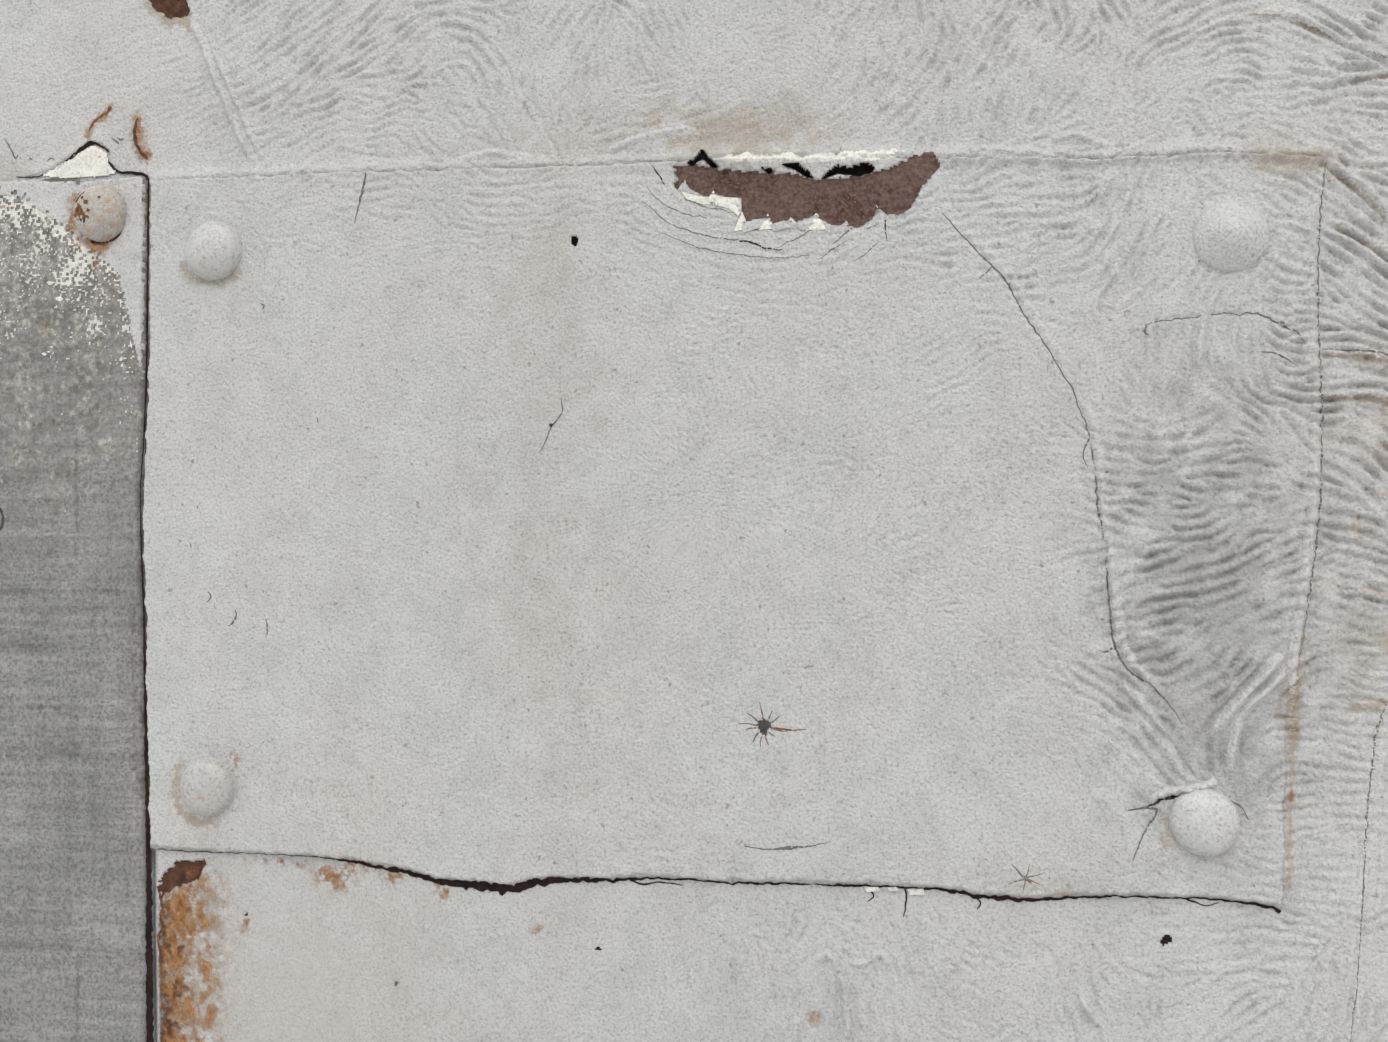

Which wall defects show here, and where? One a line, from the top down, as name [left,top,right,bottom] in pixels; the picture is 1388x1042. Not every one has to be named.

peeling [150,0,189,19]
corrosion [85,106,112,138]
corrosion [133,116,151,160]
corrosion [68,193,109,263]
peeling [643,148,940,261]
peeling [0,138,151,515]
crack [140,172,1281,1042]
corrosion [157,878,217,1042]